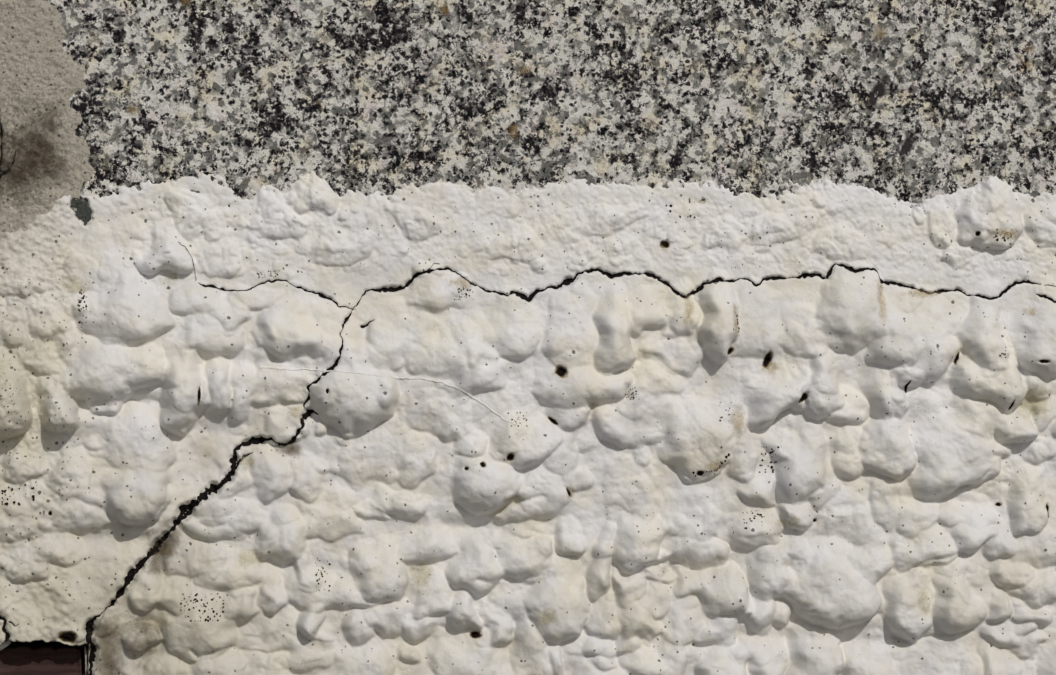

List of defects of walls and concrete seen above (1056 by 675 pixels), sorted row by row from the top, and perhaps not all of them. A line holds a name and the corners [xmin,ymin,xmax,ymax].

crack [0,110,16,179]
crack [82,242,1056,675]
crack [0,616,18,641]